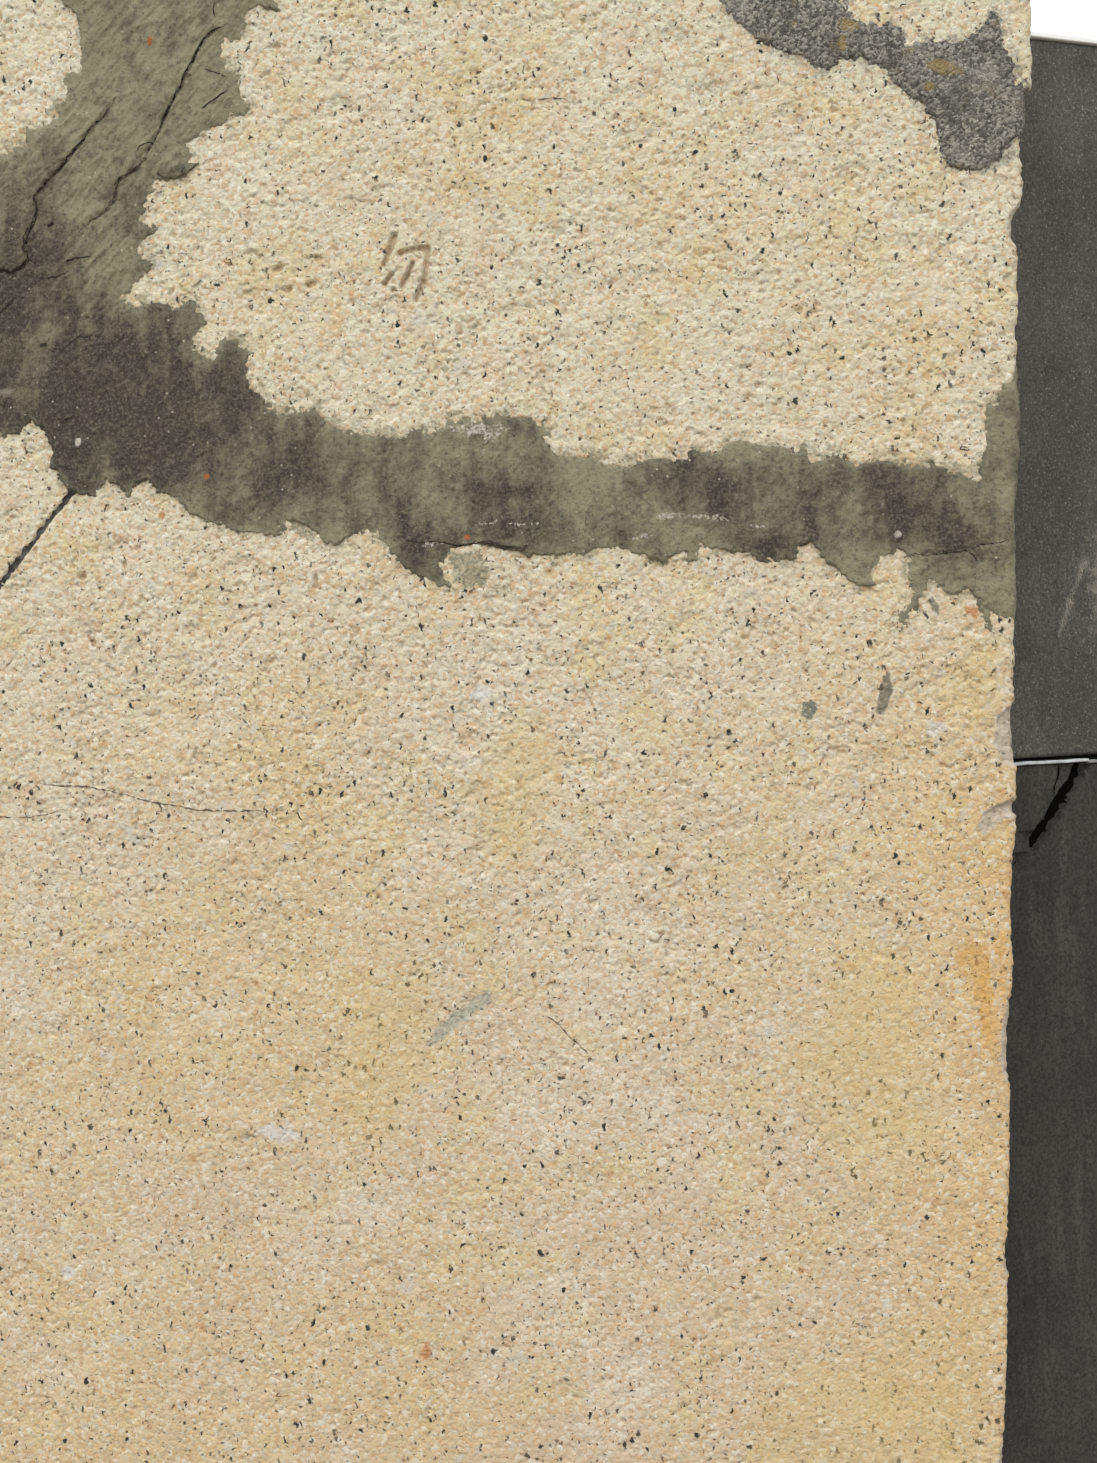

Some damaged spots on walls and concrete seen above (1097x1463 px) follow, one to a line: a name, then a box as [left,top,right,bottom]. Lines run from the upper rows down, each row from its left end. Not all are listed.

leakage [832,13,866,56]
crack [0,4,227,313]
leakage [442,413,522,451]
crack [0,466,76,588]
leakage [399,536,456,552]
leakage [625,506,780,546]
leakage [891,528,905,541]